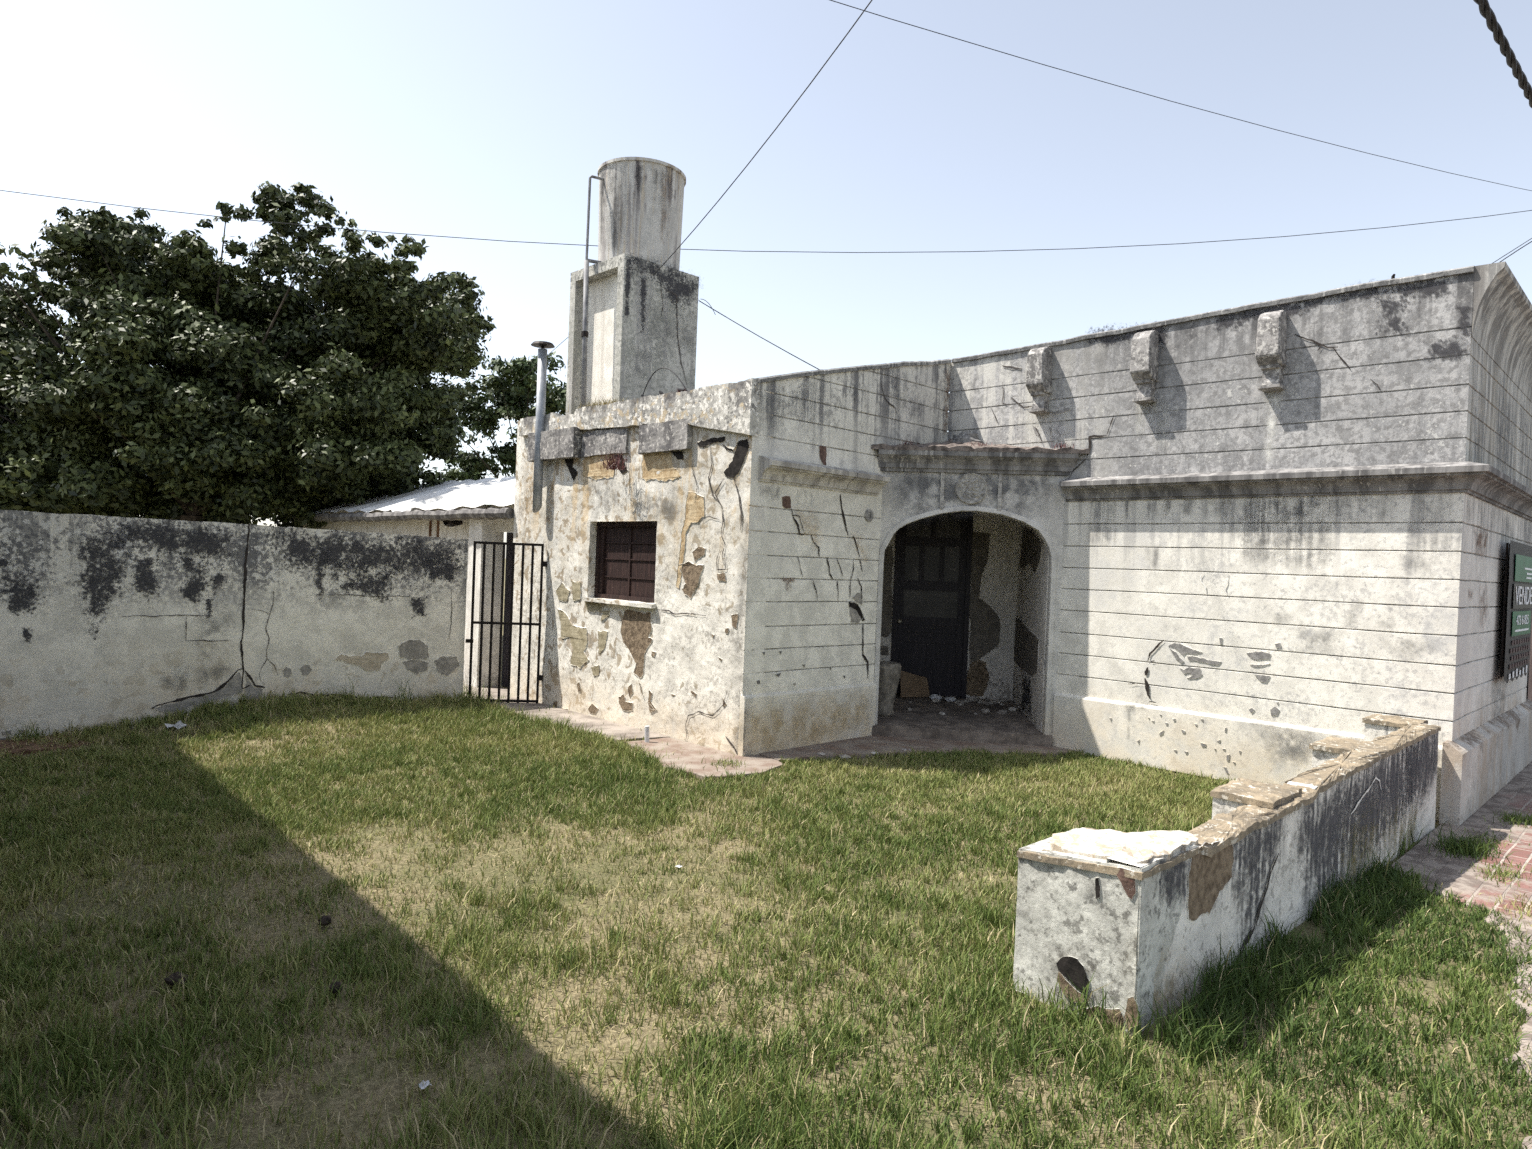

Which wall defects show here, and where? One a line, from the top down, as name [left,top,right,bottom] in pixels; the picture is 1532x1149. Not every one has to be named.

damp [625,253,700,335]
damp [1213,277,1472,361]
damp [77,520,235,640]
crack [122,524,409,709]
damp [267,526,466,618]
peeling [334,639,459,676]
peeling [555,580,657,714]
flaking render [564,436,750,599]
crack [791,494,869,673]
peeling [966,527,1046,697]
flaking render [1187,838,1234,921]
damp [1299,731,1439,901]